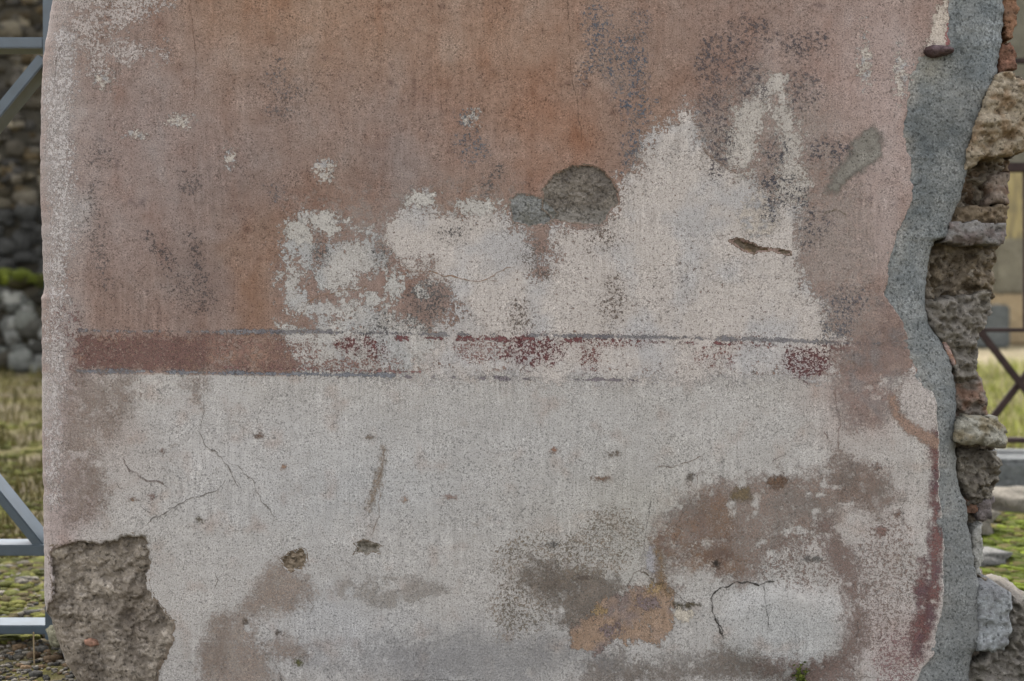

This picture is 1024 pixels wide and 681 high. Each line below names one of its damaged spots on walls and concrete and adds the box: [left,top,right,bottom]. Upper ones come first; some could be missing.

peeling [923,0,950,50]
peeling [269,70,875,397]
peeling [896,364,939,436]
crack [117,410,269,522]
spalling [47,531,177,681]
spalling [278,548,308,573]
spalling [569,545,700,657]
damp [362,448,919,681]
crack [711,581,774,639]